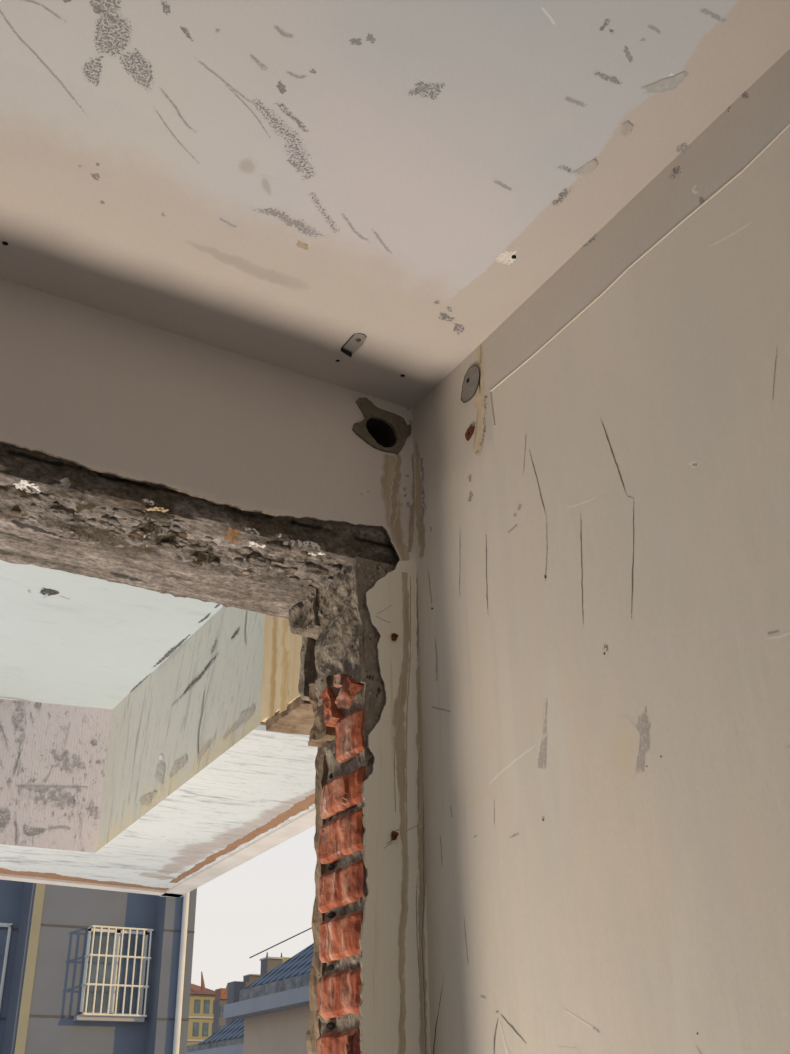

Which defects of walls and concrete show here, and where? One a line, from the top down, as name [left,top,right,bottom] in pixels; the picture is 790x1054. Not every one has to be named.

crack [771,345,779,404]
spalling [27,587,70,600]
spalling [190,547,220,566]
crack [523,432,548,582]
crack [600,418,634,619]
spalling [605,706,651,791]